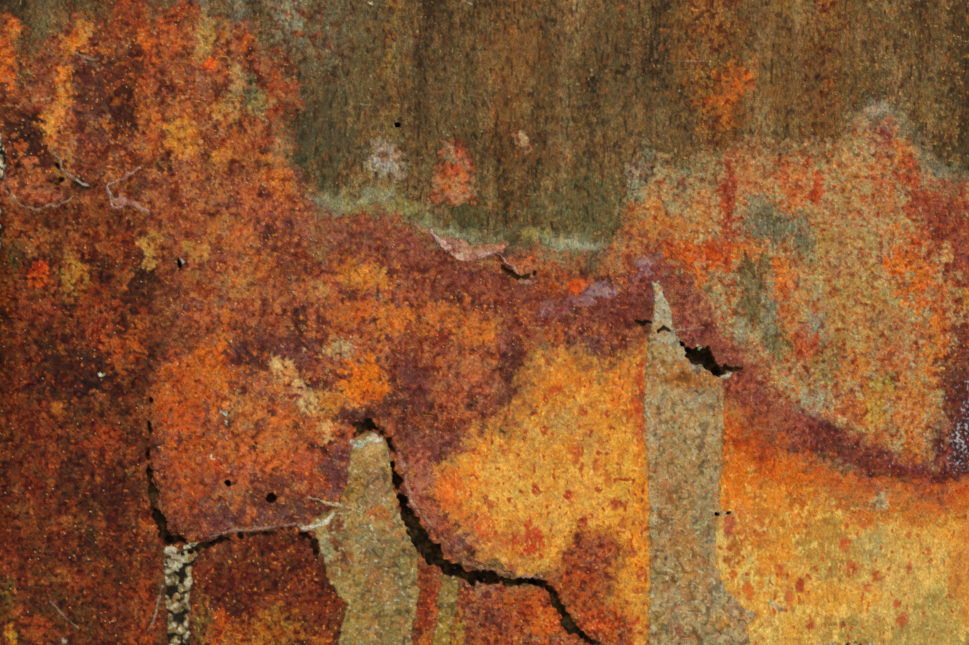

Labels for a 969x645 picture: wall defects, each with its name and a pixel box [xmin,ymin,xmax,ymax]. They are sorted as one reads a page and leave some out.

rust [0,0,325,645]
peeling [163,542,198,645]
crack [145,397,319,557]
peeling [298,432,420,645]
peeling [432,574,459,645]
rust [427,133,487,209]
crack [352,418,600,645]
peeling [429,228,537,284]
rust [510,129,533,155]
rust [130,146,969,645]
peeling [644,281,757,645]
rust [605,0,969,460]